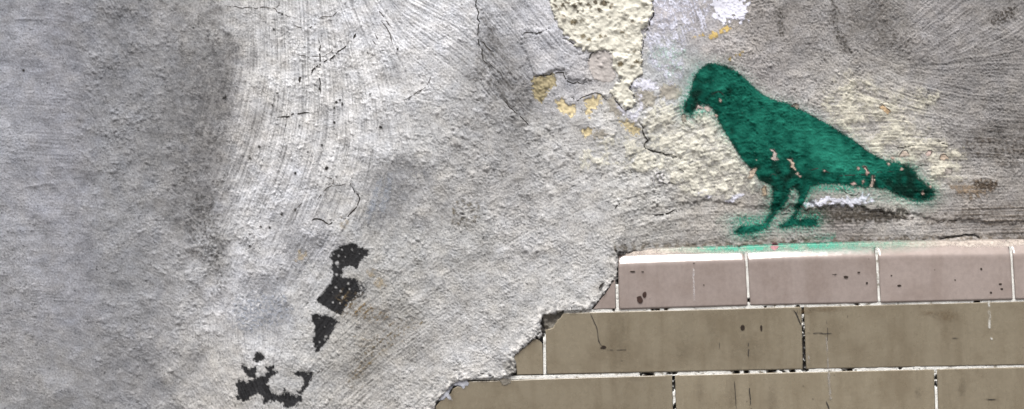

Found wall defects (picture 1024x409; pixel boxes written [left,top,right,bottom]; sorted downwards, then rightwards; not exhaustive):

crack [223,2,338,28]
crack [475,0,502,75]
crack [523,7,684,184]
peeling [549,0,767,200]
crack [294,176,360,225]
spalling [541,311,564,337]